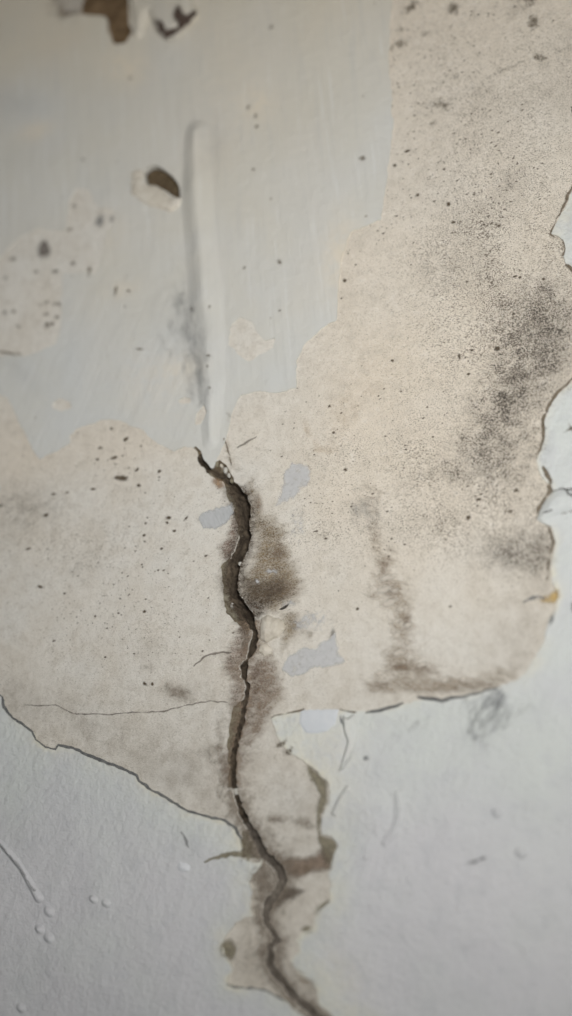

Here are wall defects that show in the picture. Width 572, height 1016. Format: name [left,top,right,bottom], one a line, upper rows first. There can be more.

peeling [55,0,198,44]
peeling [0,189,117,356]
peeling [217,0,572,861]
leakage [446,277,572,483]
peeling [0,395,253,840]
leakage [244,481,299,617]
crack [34,437,329,1016]
leakage [248,659,281,744]
peeling [224,857,310,1016]
leakage [274,888,301,908]
peeling [270,859,333,1016]
leakage [273,767,337,877]